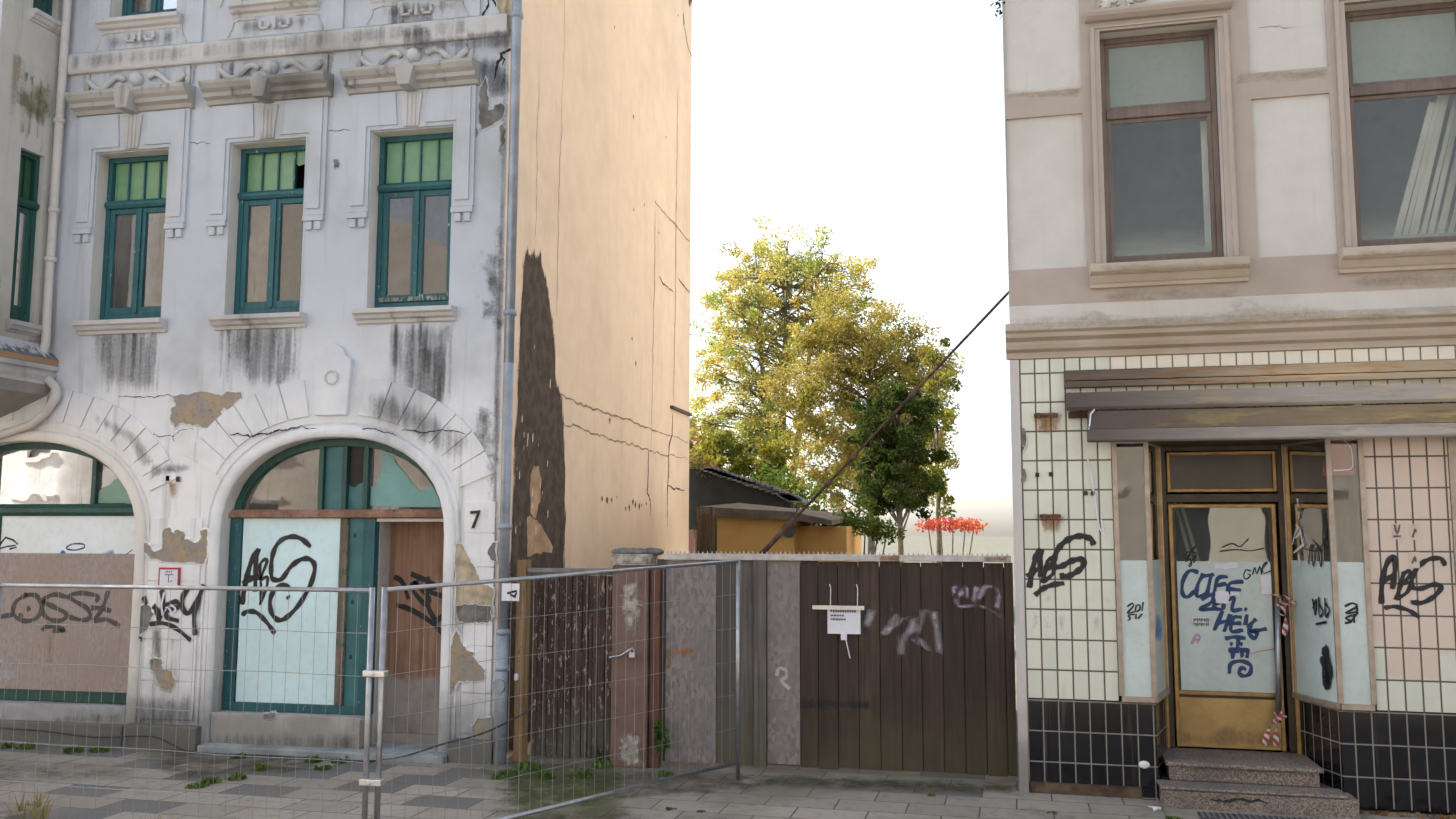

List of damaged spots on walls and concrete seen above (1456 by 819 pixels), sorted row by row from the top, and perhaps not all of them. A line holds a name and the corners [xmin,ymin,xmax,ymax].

leakage [395,334,442,400]
crack [560,179,691,527]
flaking render [169,389,244,430]
peeling [448,249,566,754]
flaking render [142,526,209,566]